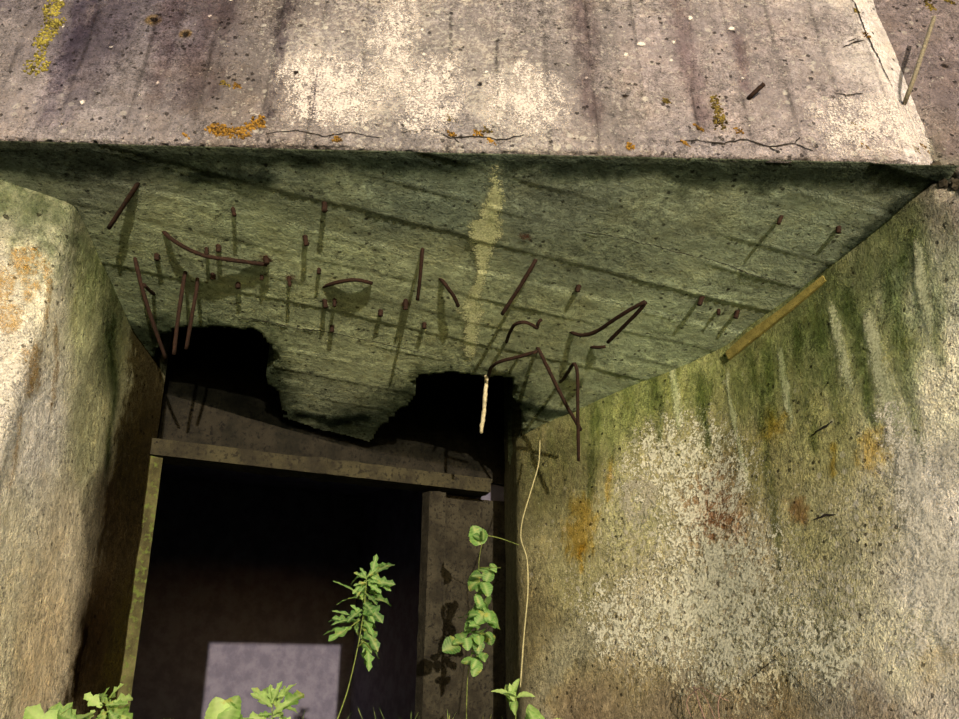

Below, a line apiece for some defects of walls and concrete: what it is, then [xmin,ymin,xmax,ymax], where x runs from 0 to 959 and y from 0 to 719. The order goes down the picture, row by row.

damp [278,0,465,135]
damp [485,61,569,134]
crack [844,0,893,87]
damp [0,94,951,358]
spalling [500,259,537,316]
spalling [505,318,543,343]
spalling [487,347,582,461]
damp [726,372,749,485]
damp [778,347,793,423]
damp [829,302,853,389]